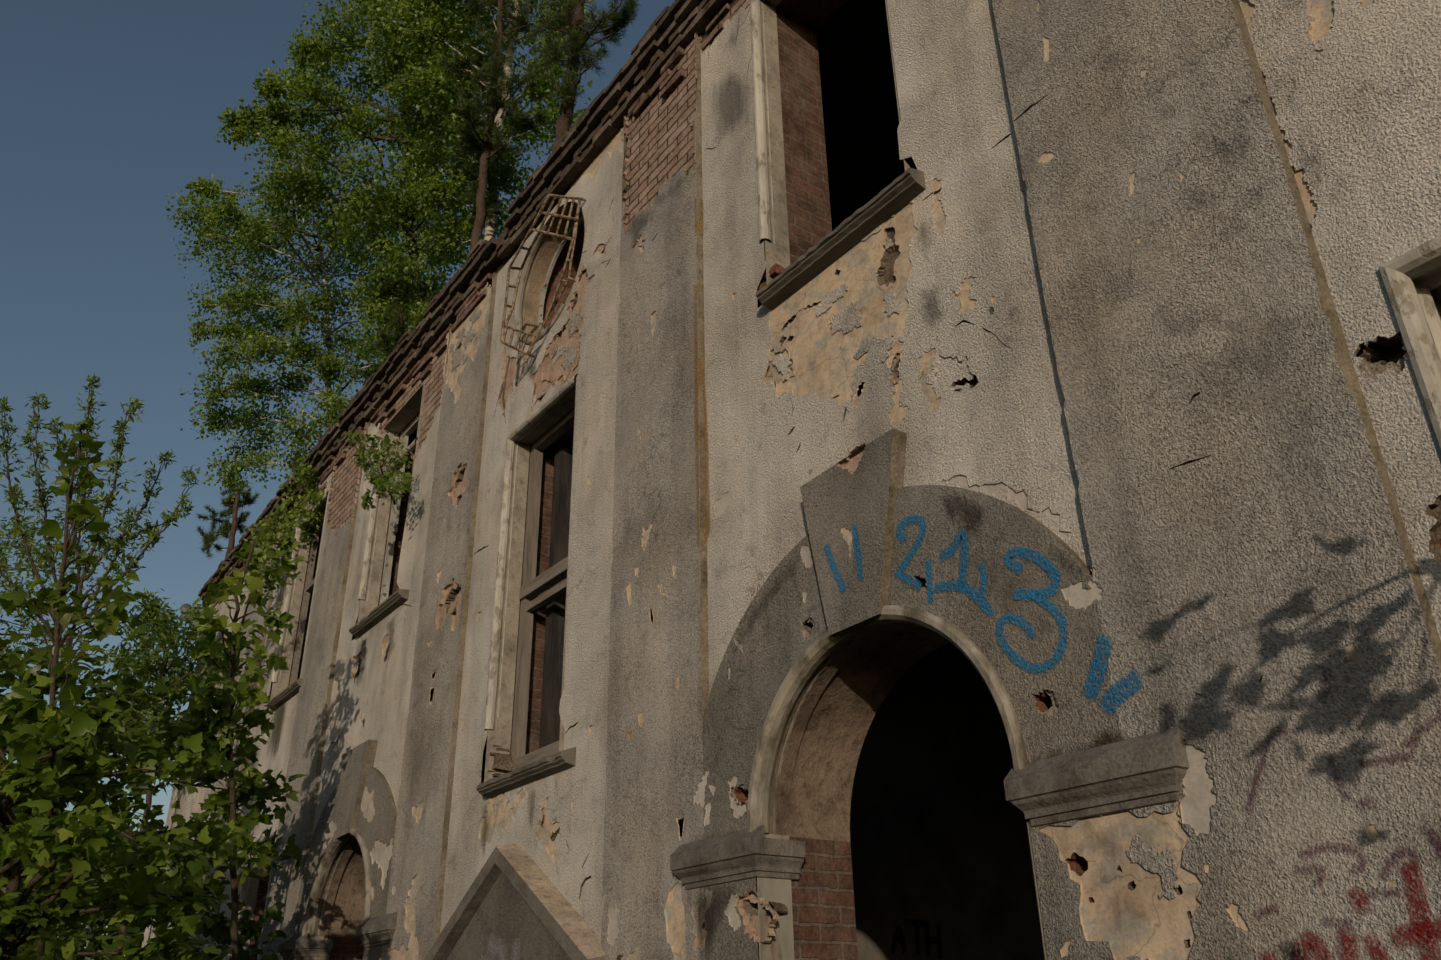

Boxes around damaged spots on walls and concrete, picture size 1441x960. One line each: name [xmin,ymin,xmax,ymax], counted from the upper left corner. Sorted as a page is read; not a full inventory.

peeling [498,243,606,416]
peeling [758,203,978,427]
hole [1359,337,1407,365]
peeling [326,282,492,531]
spalling [1426,494,1441,562]
spalling [427,568,461,647]
peeling [321,820,337,849]
peeling [361,786,375,822]
peeling [676,771,749,841]
peeling [1038,743,1217,960]
peeling [370,837,419,960]
peeling [664,882,788,960]